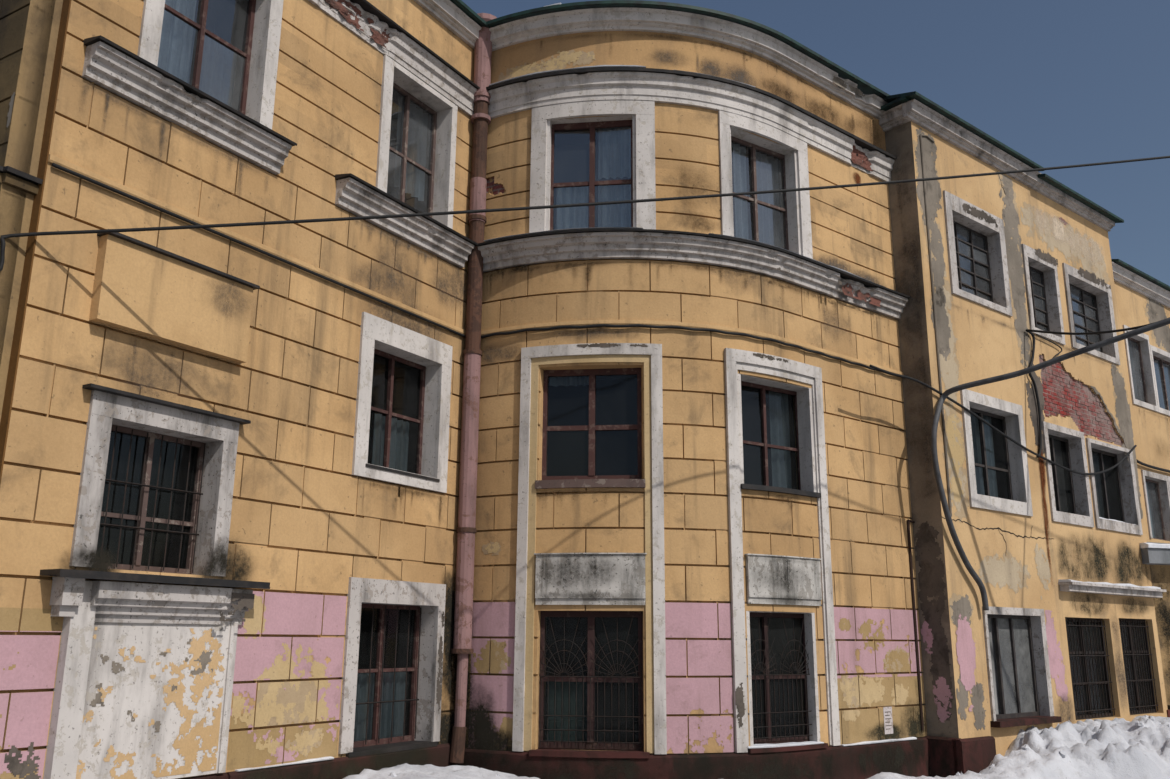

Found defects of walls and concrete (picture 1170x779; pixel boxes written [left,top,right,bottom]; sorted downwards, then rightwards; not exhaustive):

flaking render [913,127,970,522]
flaking render [963,174,1143,519]
peeling [76,760,86,779]
peeling [82,591,347,779]
flaking render [834,521,986,744]
damp [1124,584,1170,646]